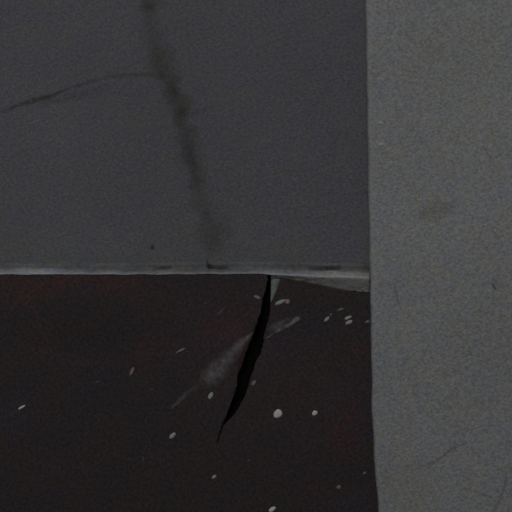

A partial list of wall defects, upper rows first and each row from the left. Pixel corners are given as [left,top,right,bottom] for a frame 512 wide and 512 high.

crack [217,275,271,442]